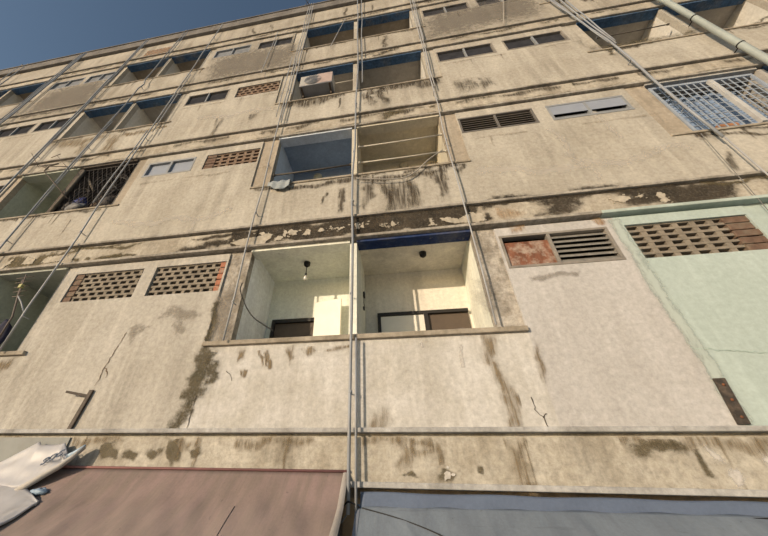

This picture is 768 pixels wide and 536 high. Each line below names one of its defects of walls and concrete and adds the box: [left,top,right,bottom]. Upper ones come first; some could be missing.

peeling [230,221,370,246]
water stain [114,164,768,251]
peeling [428,212,487,226]
peeling [608,192,673,204]
water stain [169,290,234,428]
water stain [485,338,521,426]
water stain [405,440,444,463]
water stain [513,441,533,494]
water stain [625,437,767,477]